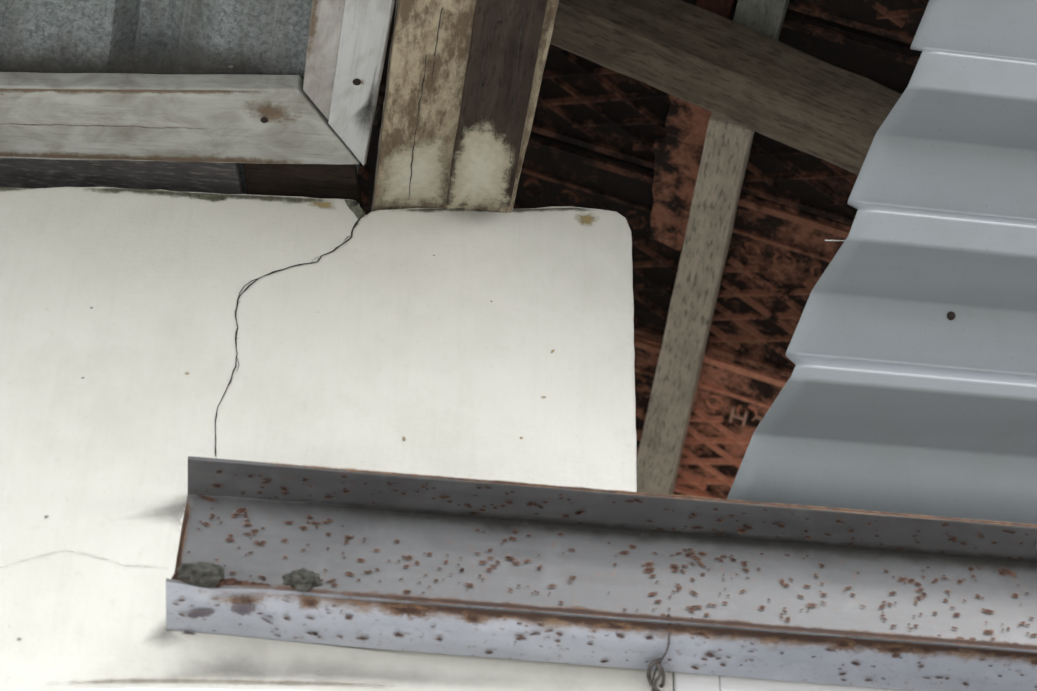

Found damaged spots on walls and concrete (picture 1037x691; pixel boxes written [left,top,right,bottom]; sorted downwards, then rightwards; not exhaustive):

crack [215,211,365,456]
corrosion [171,470,289,580]
corrosion [207,515,1037,679]
corrosion [302,466,1037,557]